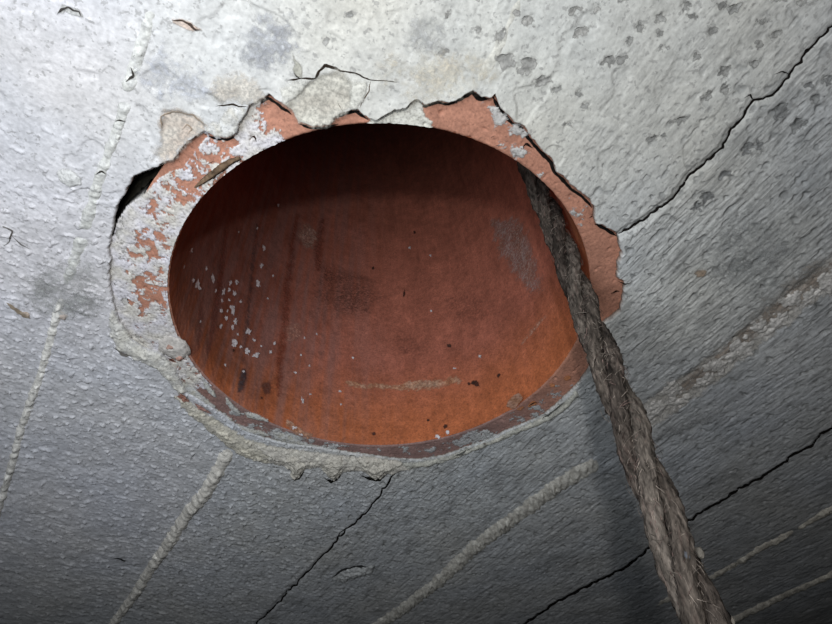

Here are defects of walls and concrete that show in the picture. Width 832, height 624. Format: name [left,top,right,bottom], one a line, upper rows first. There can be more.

spalling [280,59,367,126]
peeling [369,100,433,128]
peeling [487,106,529,160]
hole [600,55,628,67]
crack [422,25,832,236]
hole [655,12,669,50]
hole [700,65,731,101]
hole [718,1,743,14]
peeling [109,76,349,449]
crack [688,426,832,522]
crack [256,474,395,624]
crack [525,546,650,624]